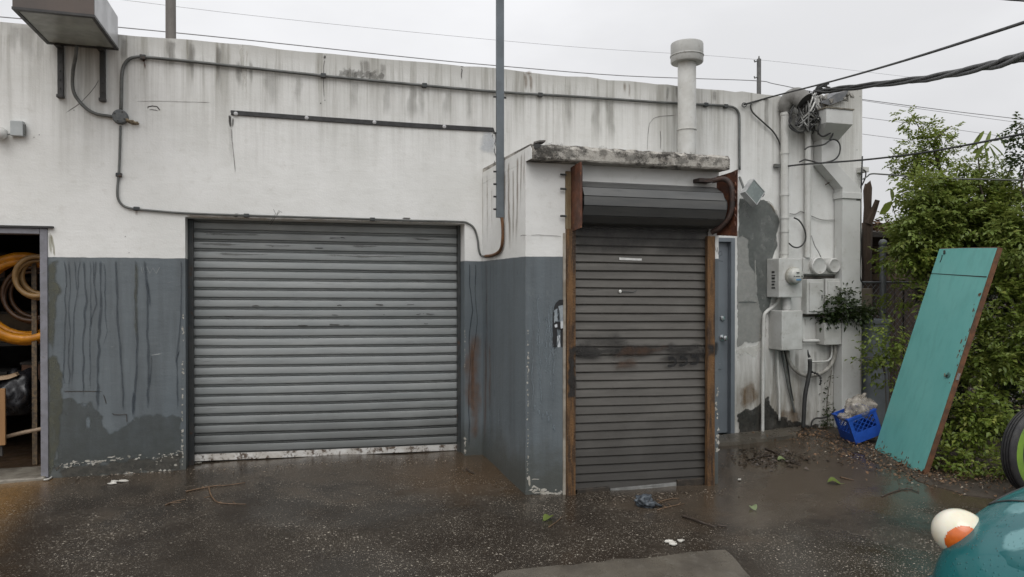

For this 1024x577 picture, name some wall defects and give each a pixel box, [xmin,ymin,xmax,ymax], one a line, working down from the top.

leakage [54,262,181,468]
peeling [55,389,184,478]